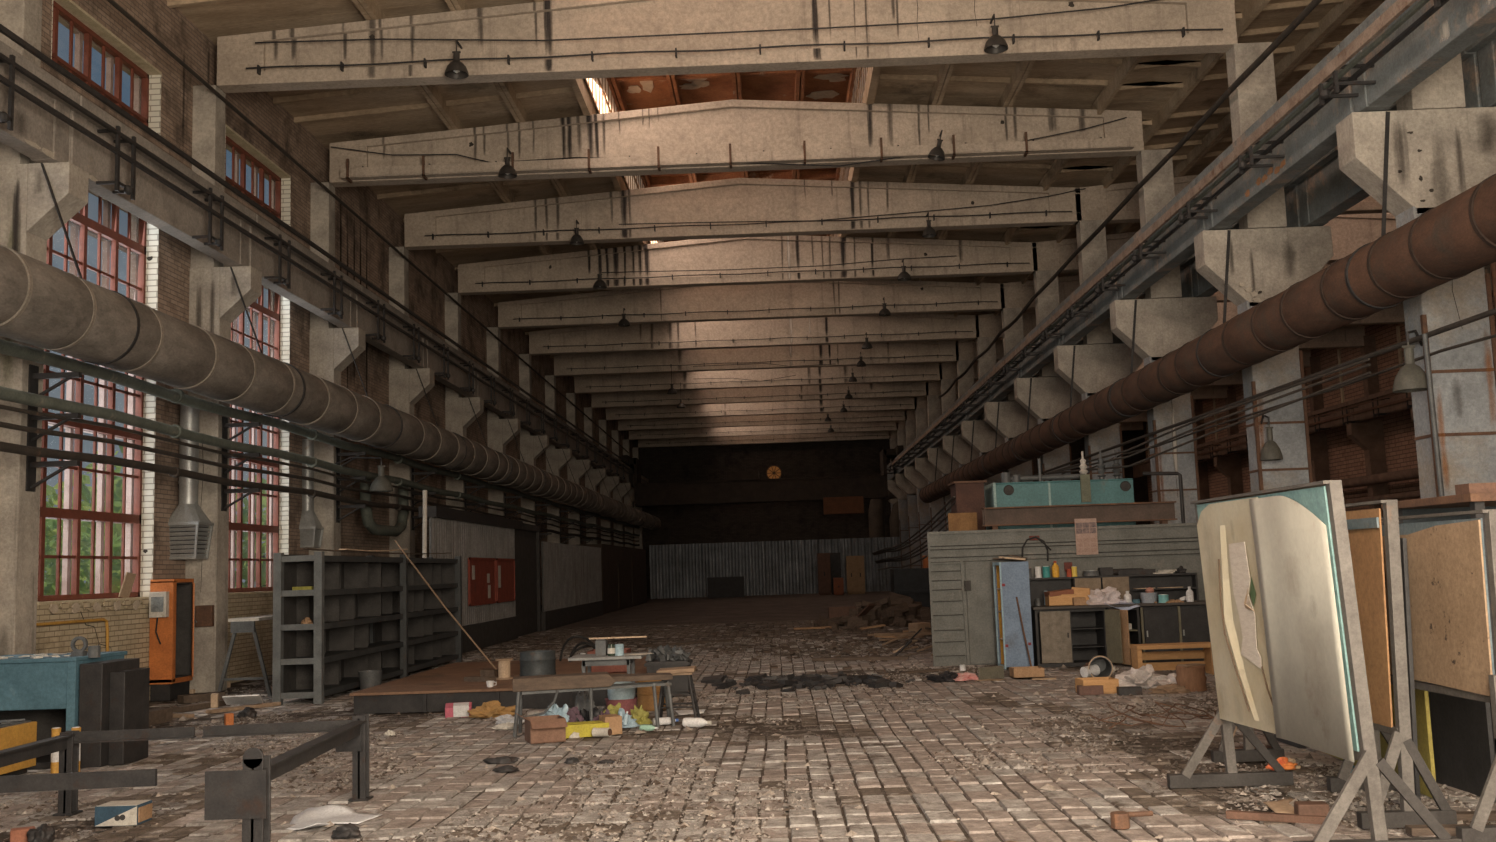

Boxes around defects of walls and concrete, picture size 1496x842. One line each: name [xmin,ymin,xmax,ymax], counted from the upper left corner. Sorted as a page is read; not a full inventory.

water stain [812,0,830,59]
water stain [561,112,620,157]